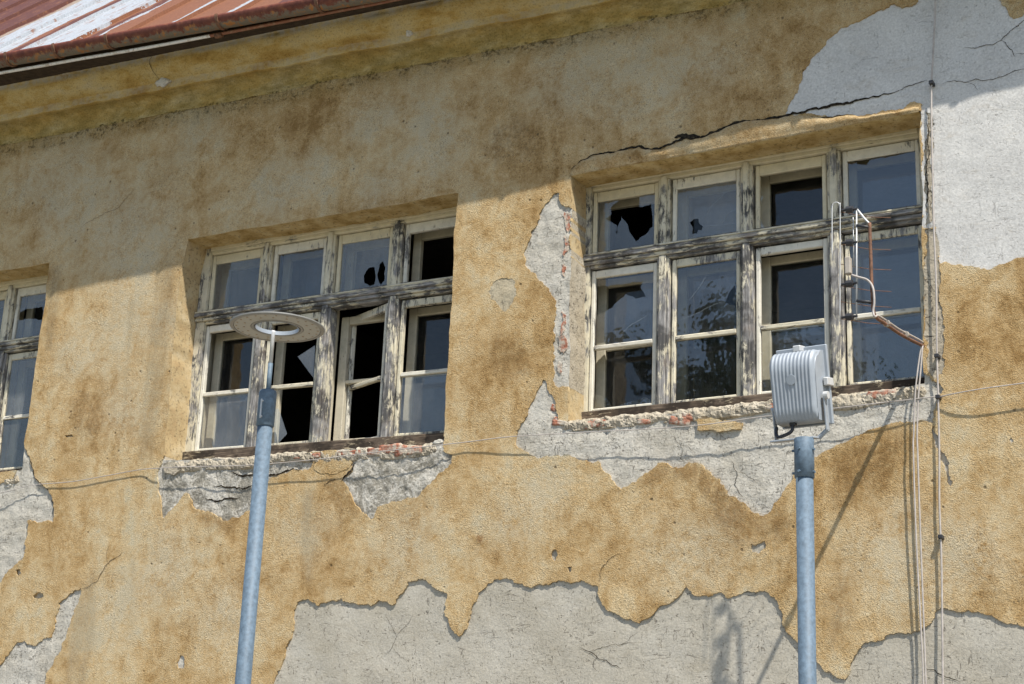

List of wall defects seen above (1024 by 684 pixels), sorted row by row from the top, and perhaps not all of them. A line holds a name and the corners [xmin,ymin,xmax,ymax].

crack [573,20,1024,167]
peeling [786,0,1024,270]
flaking render [489,278,517,312]
peeling [516,193,944,516]
peeling [0,447,54,582]
peeling [158,456,253,521]
peeling [268,440,452,519]
peeling [0,590,81,684]
peeling [274,567,798,684]
peeling [816,608,1024,684]